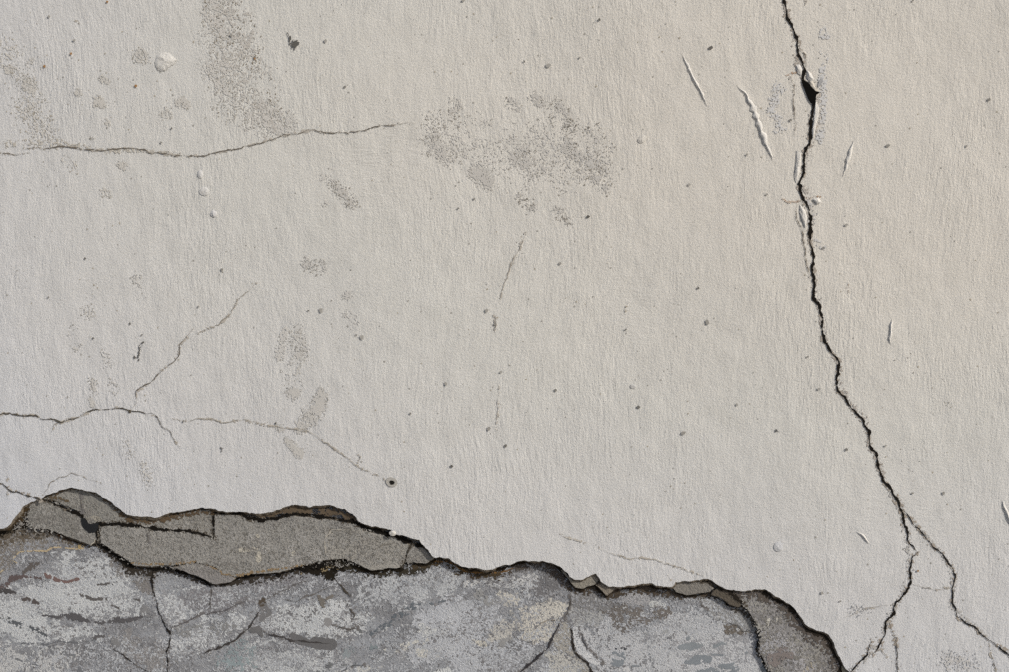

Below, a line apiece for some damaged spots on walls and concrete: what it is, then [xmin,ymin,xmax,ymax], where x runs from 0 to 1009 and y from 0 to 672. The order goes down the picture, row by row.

crack [0,122,411,157]
crack [493,232,527,331]
crack [0,282,385,480]
crack [782,0,1009,672]
peeling [0,488,849,672]
crack [518,594,605,672]
crack [562,534,751,633]